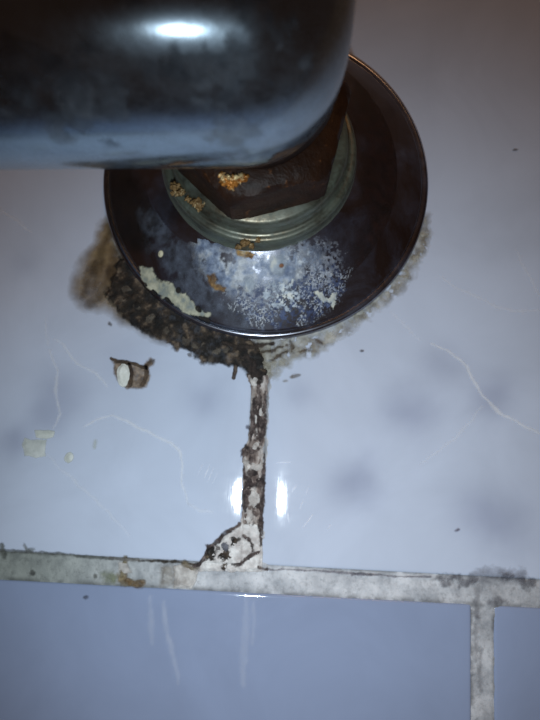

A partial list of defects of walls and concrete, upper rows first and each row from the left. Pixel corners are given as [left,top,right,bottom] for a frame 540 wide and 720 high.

leakage [105,258,275,384]
leakage [241,448,263,495]